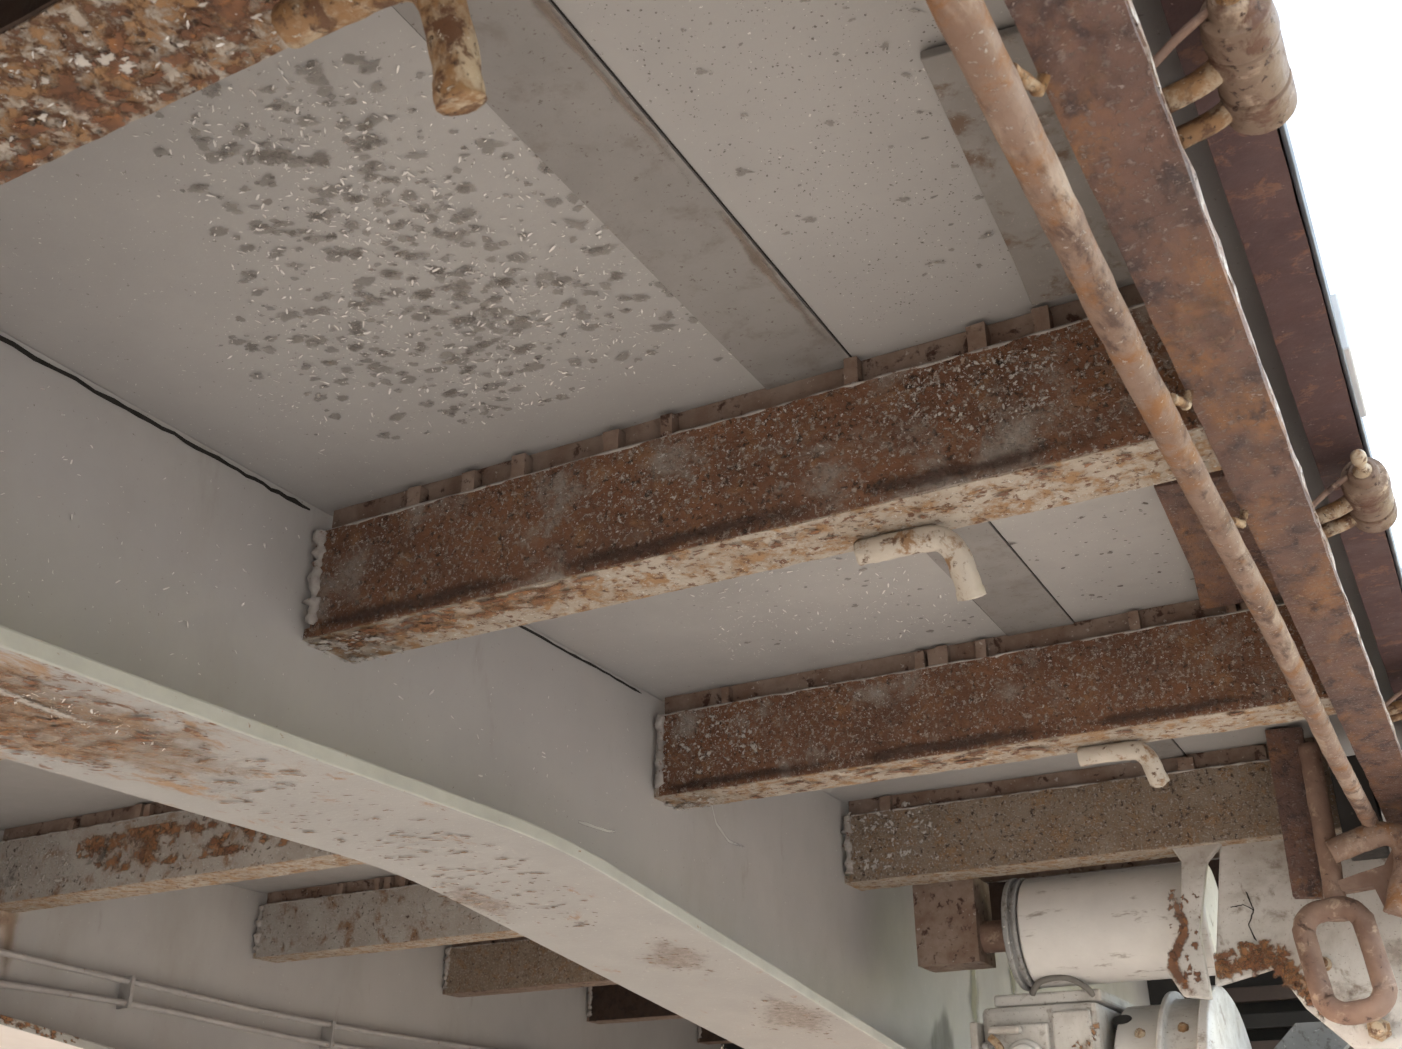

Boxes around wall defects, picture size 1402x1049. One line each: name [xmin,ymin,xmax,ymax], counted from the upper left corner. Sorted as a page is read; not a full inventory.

rust [0,0,283,183]
crack [0,335,310,510]
rust [319,447,1133,650]
rust [0,672,598,927]
rust [671,732,1058,798]
rust [1099,698,1245,734]
rust [1167,889,1324,1018]